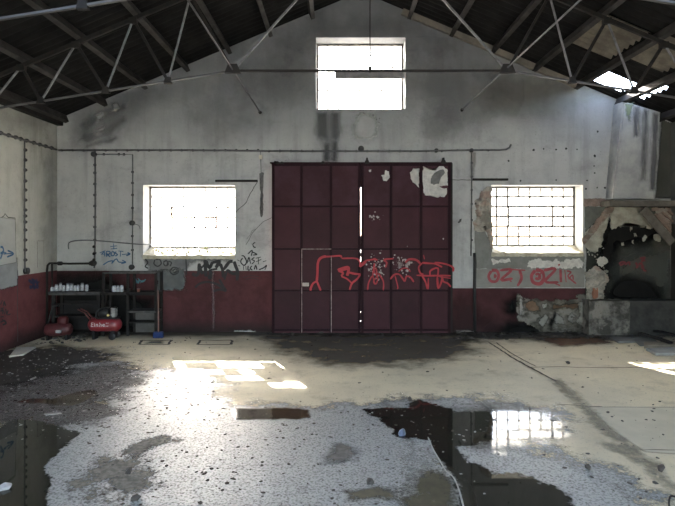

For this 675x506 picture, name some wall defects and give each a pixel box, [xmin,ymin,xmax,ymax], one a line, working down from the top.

peeling [410,166,448,198]
spalling [473,186,494,249]
spalling [516,198,661,332]
water stain [625,103,671,198]